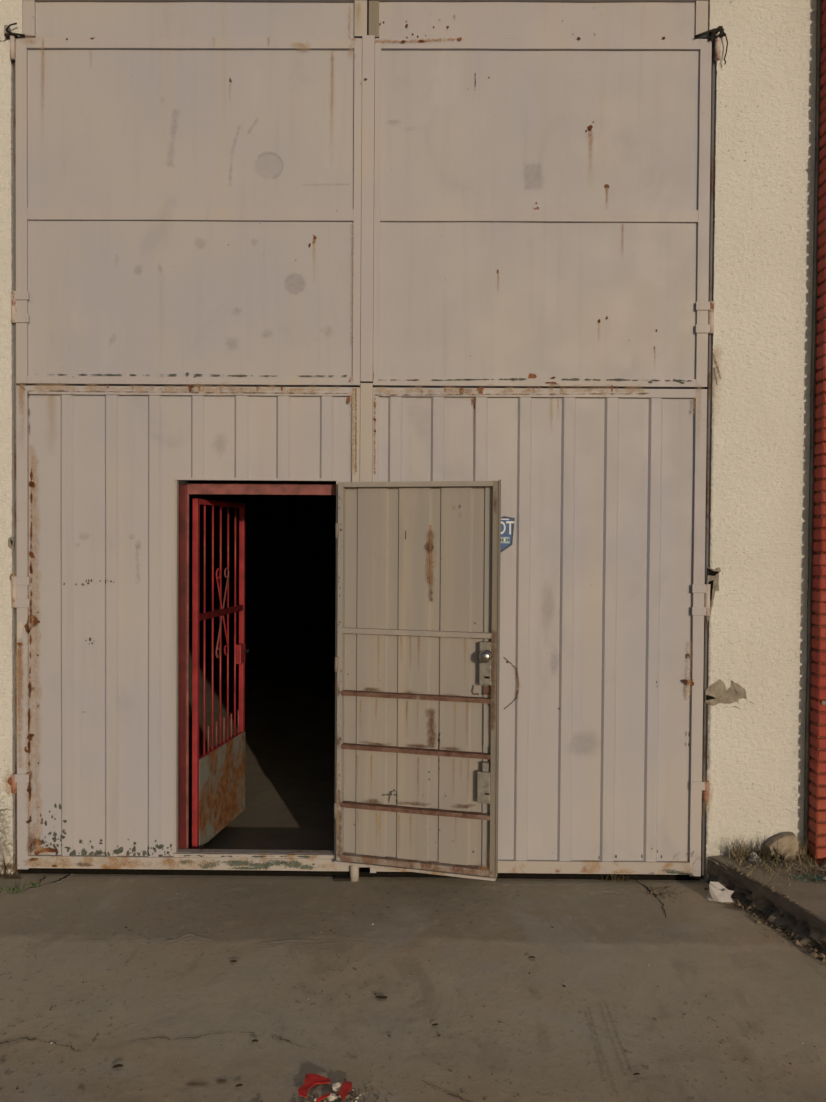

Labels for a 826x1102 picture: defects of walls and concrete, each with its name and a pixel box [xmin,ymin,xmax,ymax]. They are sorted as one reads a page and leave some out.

rust [444,387,515,408]
rust [17,462,40,824]
flaking render [705,679,750,706]
rust [29,838,46,861]